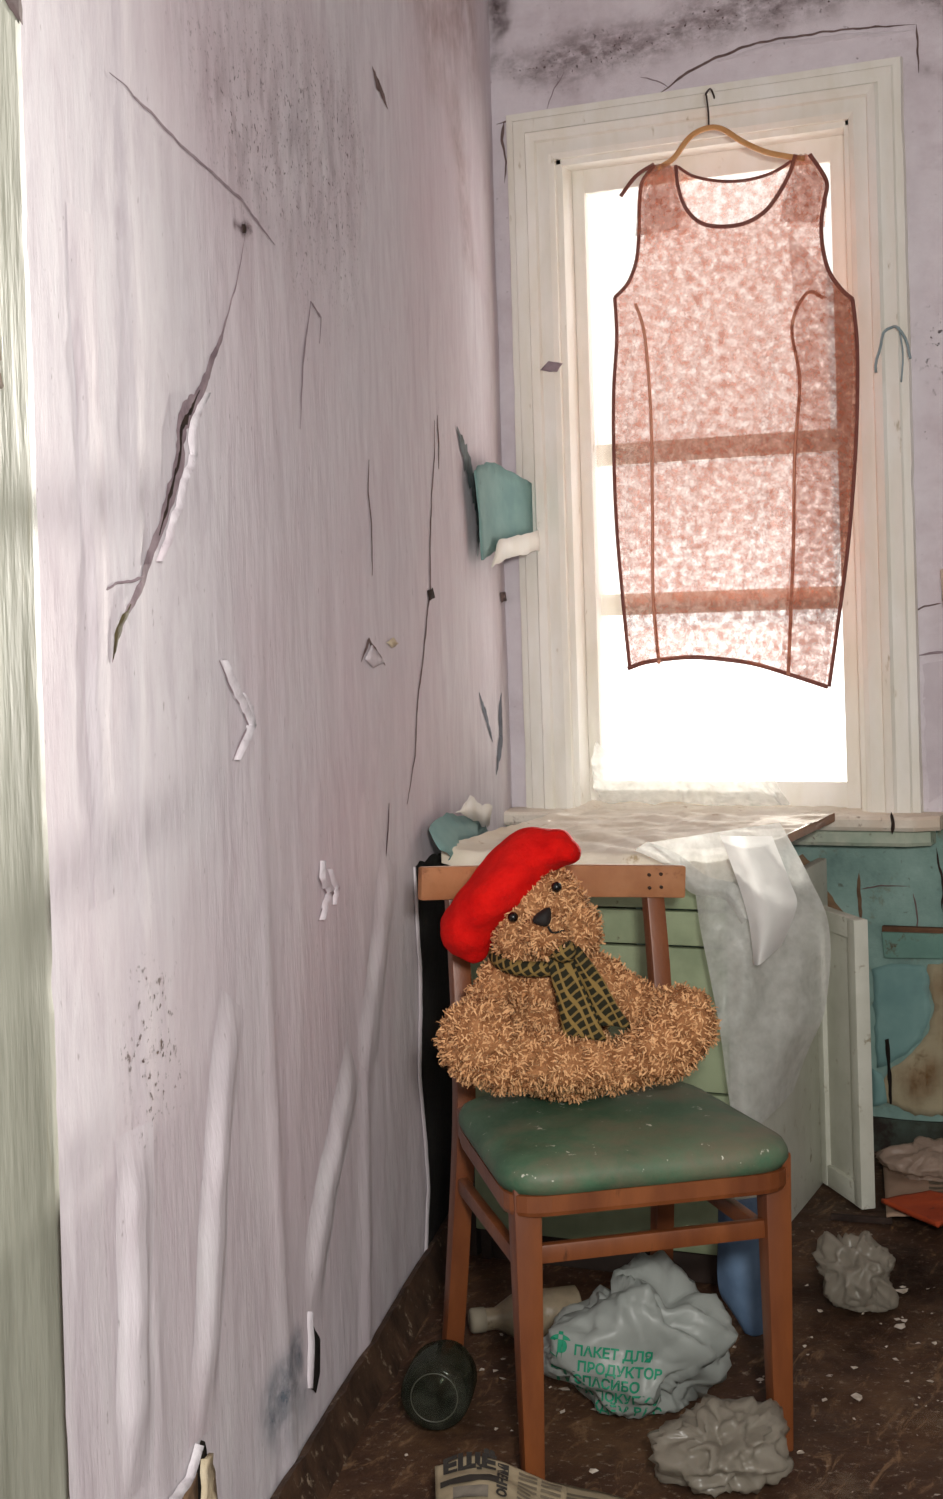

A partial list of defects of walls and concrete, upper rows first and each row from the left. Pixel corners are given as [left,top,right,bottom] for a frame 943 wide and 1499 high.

water stain [519,0,793,78]
crack [106,72,275,662]
peeling [871,963,943,1117]
flaking render [200,1453,218,1499]